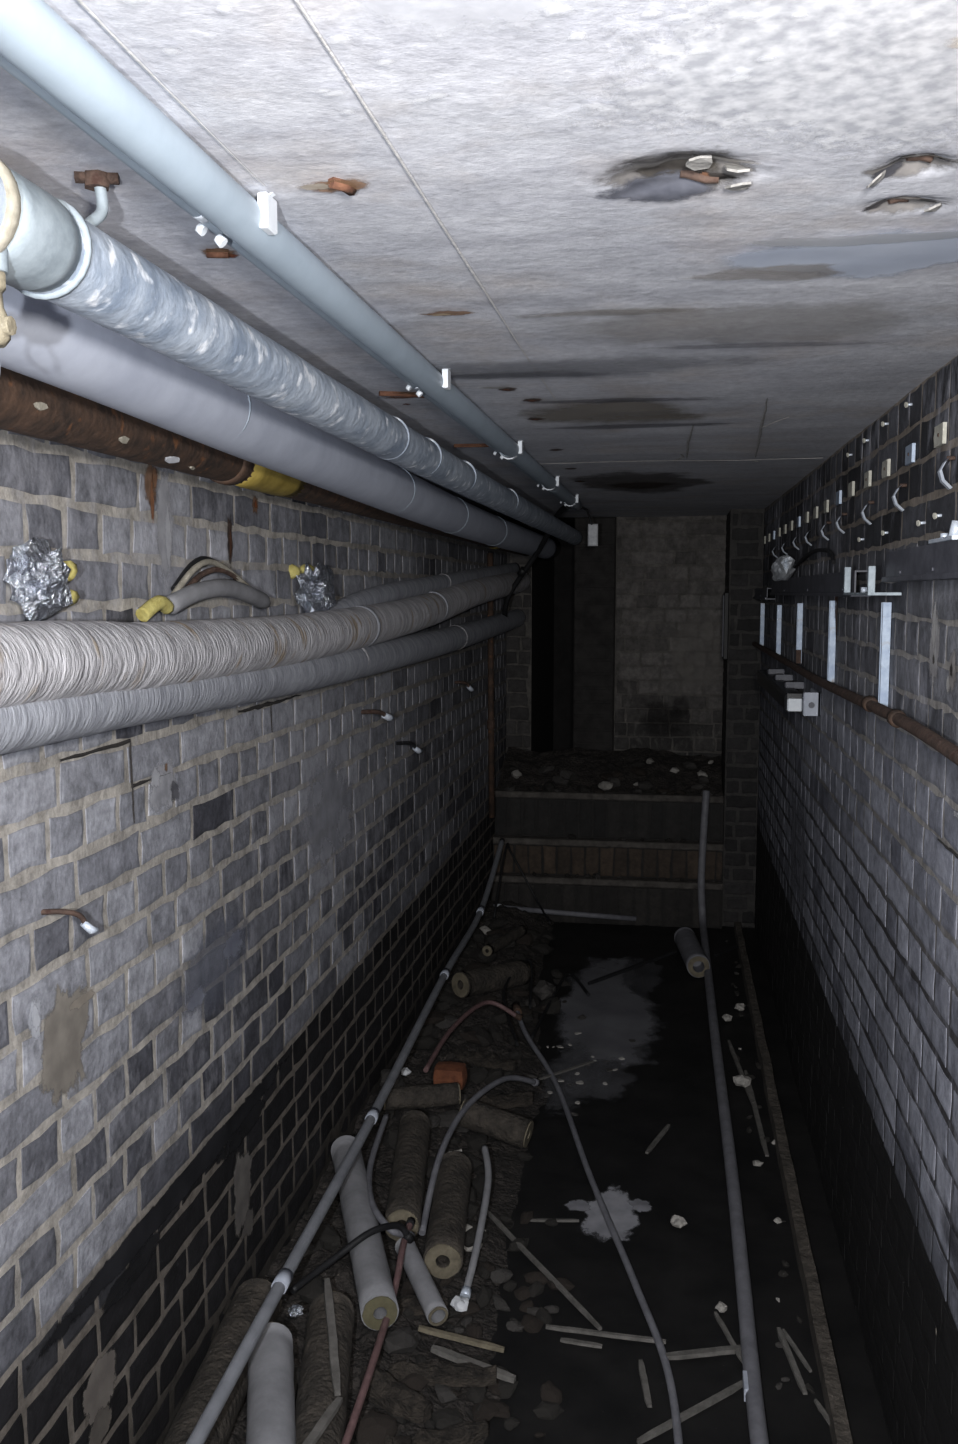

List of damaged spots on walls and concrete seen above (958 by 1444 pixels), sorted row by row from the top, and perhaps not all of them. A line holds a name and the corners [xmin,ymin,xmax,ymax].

rust [301,177,366,196]
spalling [599,151,755,201]
spalling [863,153,958,214]
rust [202,248,238,258]